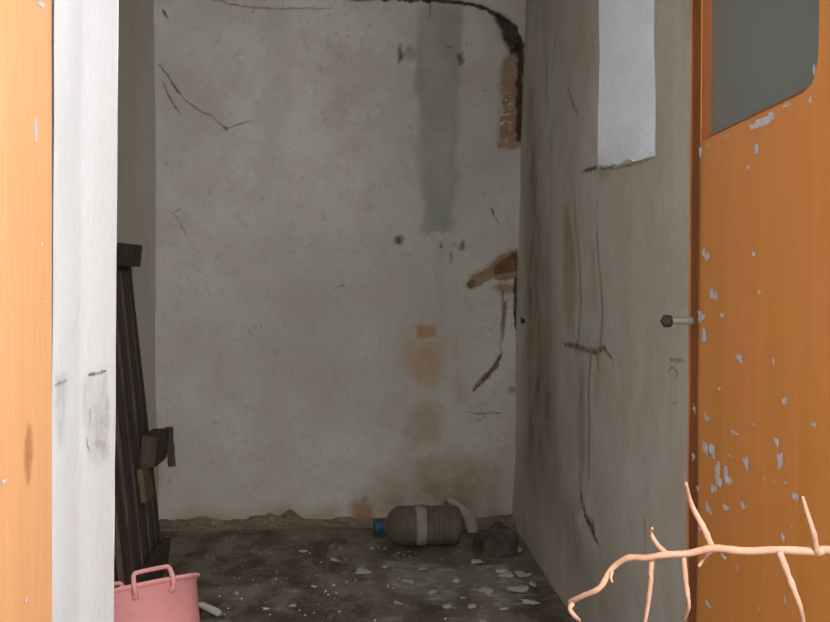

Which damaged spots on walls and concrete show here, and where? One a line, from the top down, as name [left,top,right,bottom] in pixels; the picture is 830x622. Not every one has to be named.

crack [355,0,522,54]
flaking render [497,43,524,150]
peeling [749,111,775,130]
leakage [158,0,637,622]
crack [473,355,502,391]
flaking render [467,251,518,291]
crack [503,249,517,329]
crack [565,343,612,359]
peeling [698,311,707,343]
peeling [692,439,732,493]
peeling [774,437,784,470]
crack [578,468,597,542]